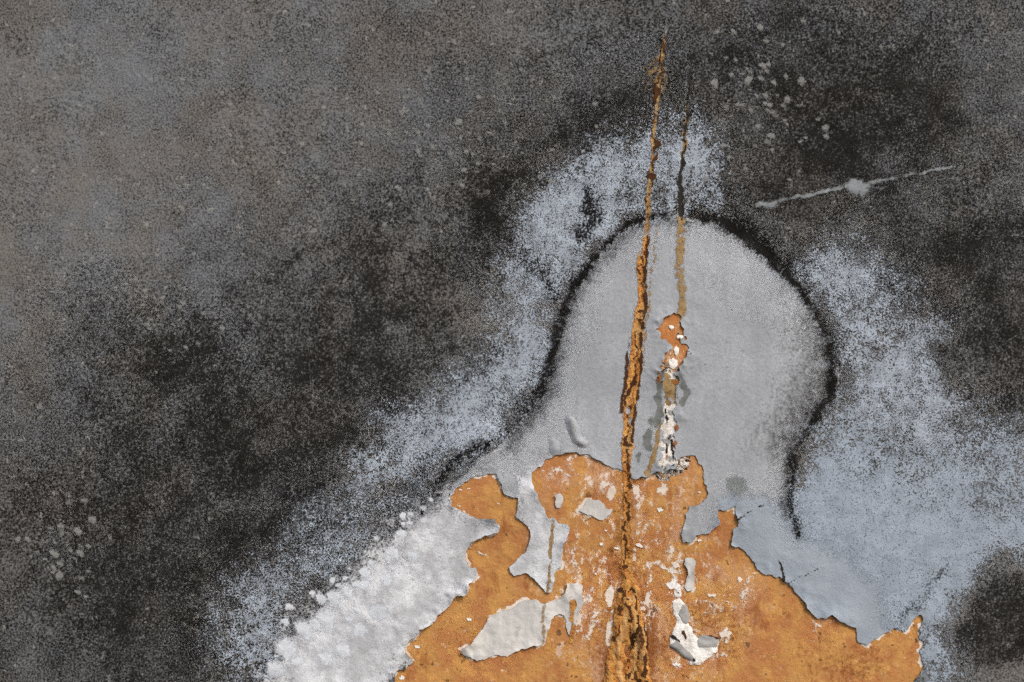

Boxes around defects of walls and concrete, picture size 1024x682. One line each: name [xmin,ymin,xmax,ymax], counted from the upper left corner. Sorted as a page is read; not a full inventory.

leakage [59,289,131,357]
rust [593,26,668,682]
rust [675,216,687,317]
leakage [509,451,570,593]
peeling [395,313,924,682]